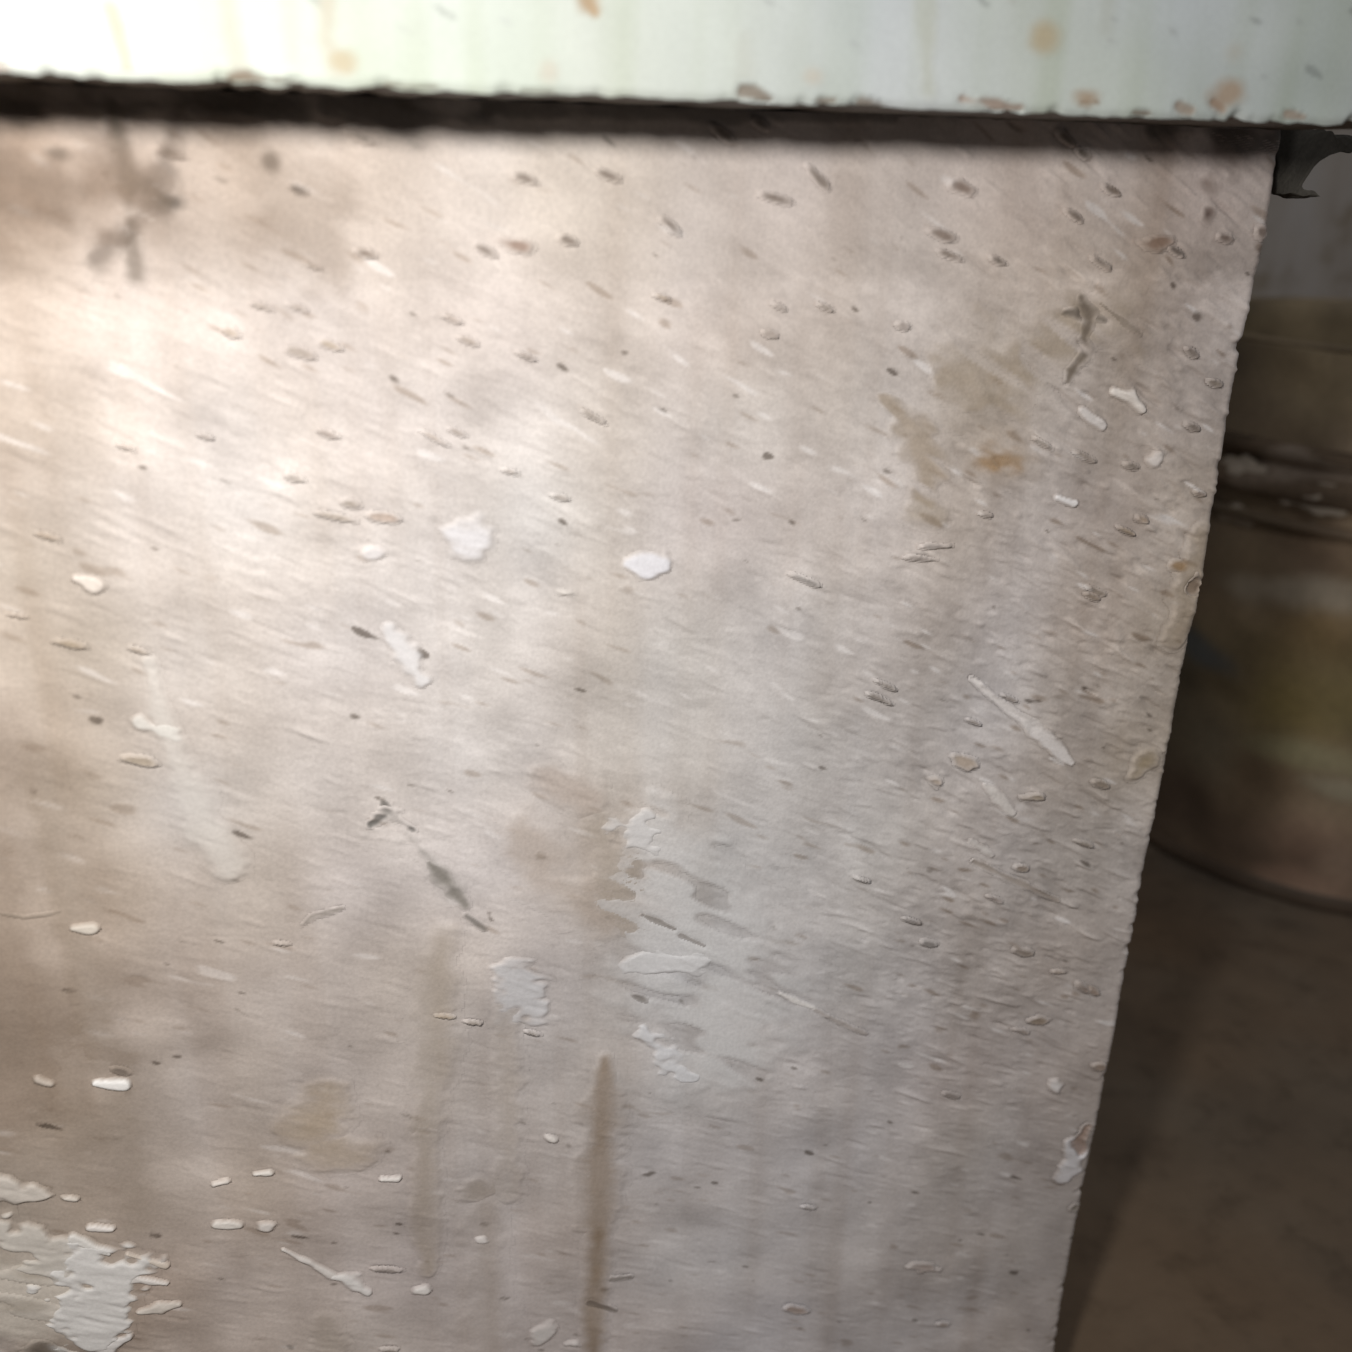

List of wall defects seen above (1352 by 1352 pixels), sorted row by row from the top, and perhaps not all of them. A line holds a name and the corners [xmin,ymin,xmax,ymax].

corrosion [569,0,607,21]
water stain [907,0,944,107]
water stain [0,0,902,324]
peeling [69,572,109,595]
peeling [436,506,499,564]
peeling [620,548,673,581]
water stain [494,756,648,951]
water stain [0,695,186,1249]
peeling [487,955,560,1037]
peeling [573,782,869,1137]
spalling [1050,1121,1094,1186]
peeling [0,1172,184,1352]